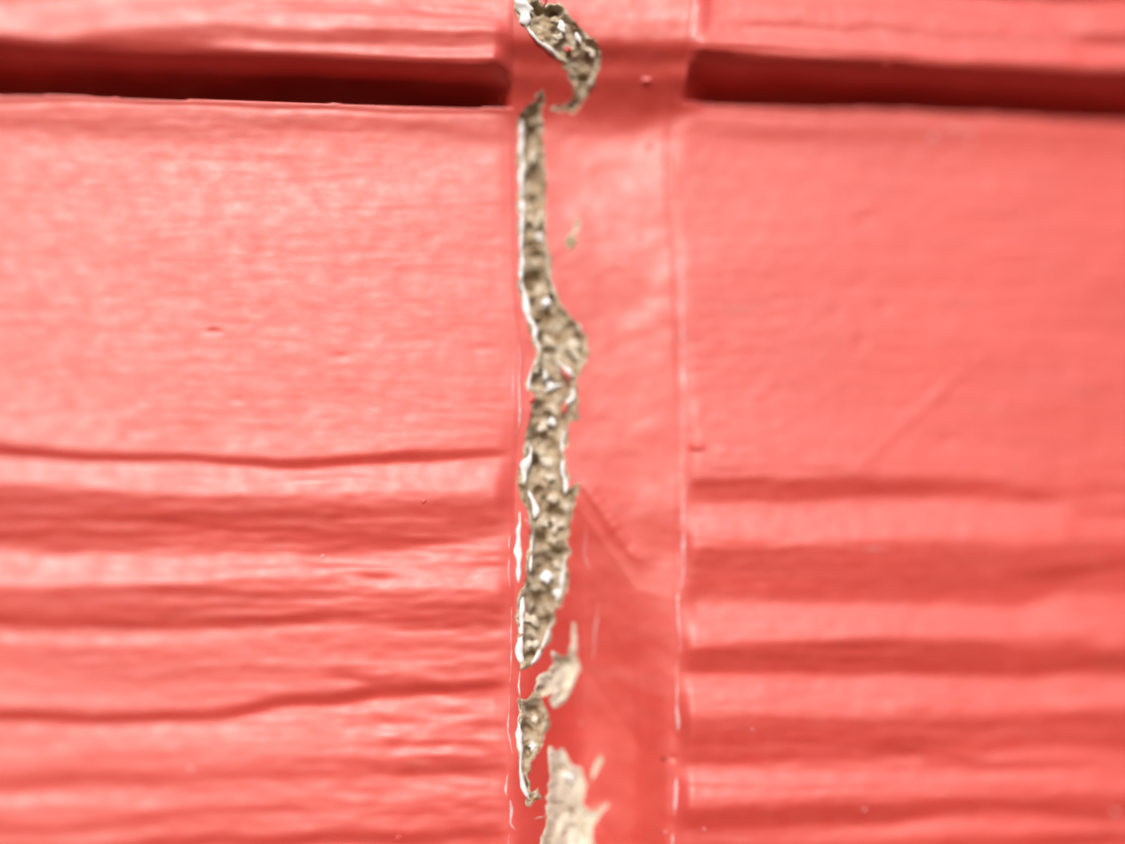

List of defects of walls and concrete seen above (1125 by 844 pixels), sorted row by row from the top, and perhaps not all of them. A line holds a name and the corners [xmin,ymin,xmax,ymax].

peeling [514,0,609,844]